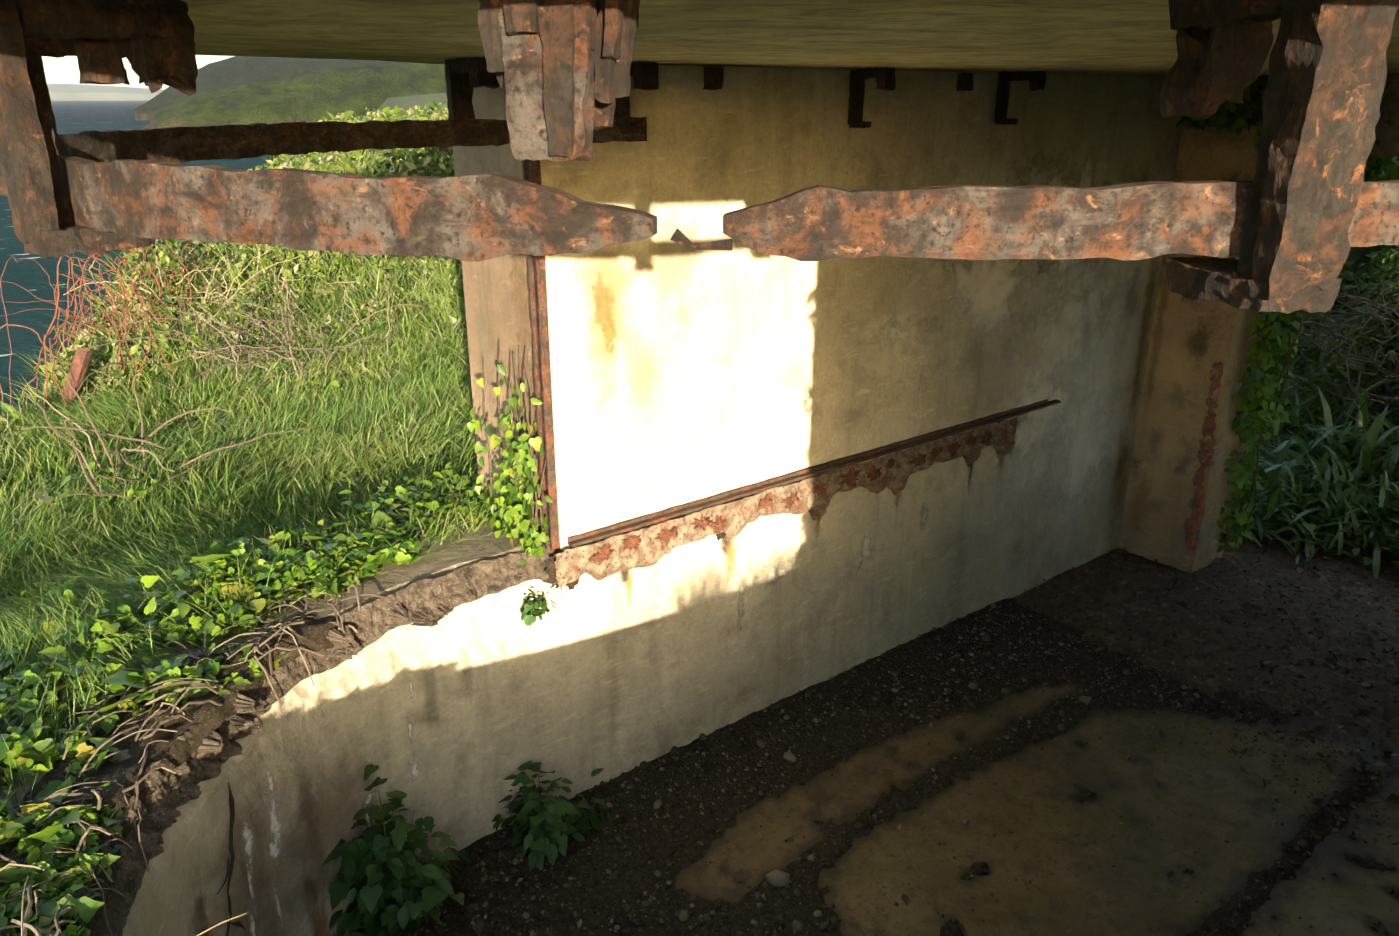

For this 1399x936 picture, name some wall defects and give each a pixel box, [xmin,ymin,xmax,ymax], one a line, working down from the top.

rust [589,258,623,357]
rust [621,571,632,601]
rust [722,539,735,569]
crack [217,782,246,936]
leakage [243,823,254,898]
leakage [266,770,282,860]